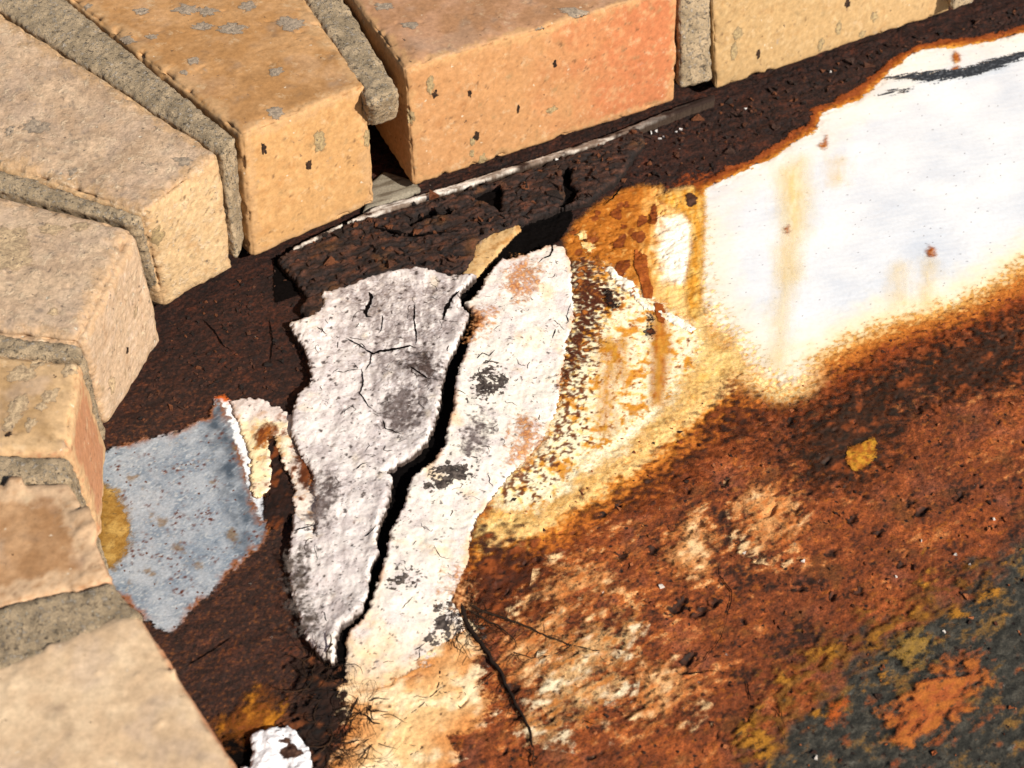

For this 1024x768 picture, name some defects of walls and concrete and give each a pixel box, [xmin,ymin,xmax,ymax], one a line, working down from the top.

peeling [103,394,317,632]
corrosion [165,190,462,402]
crack [315,197,573,702]
corrosion [329,7,1024,768]